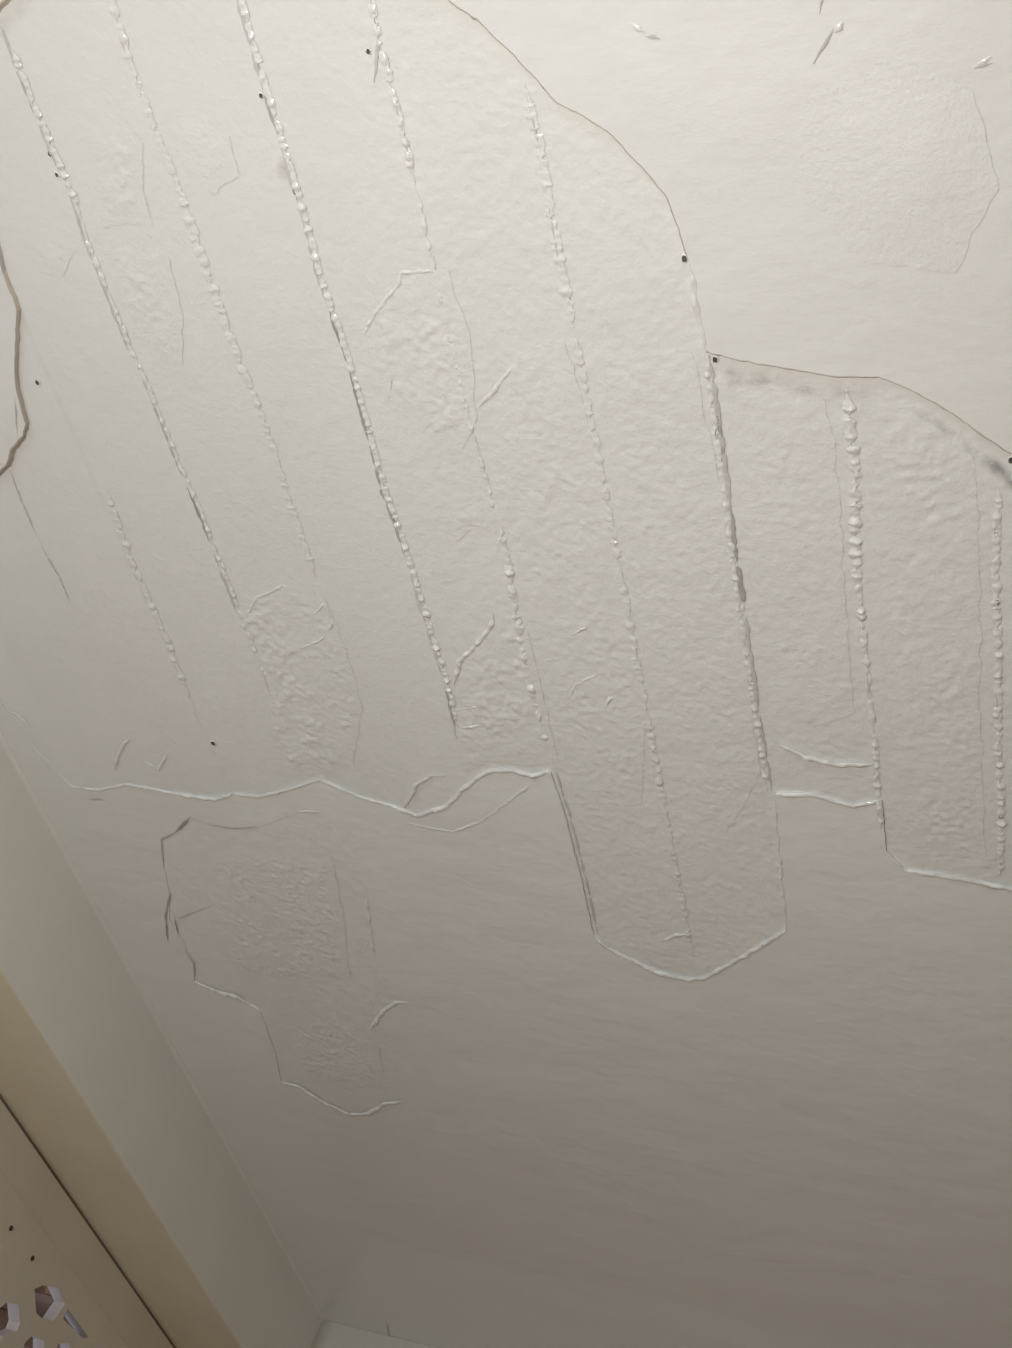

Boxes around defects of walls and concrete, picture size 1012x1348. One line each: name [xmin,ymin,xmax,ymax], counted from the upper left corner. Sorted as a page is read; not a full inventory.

crack [0,27,266,698]
crack [237,0,459,729]
crack [366,0,597,931]
crack [813,0,834,64]